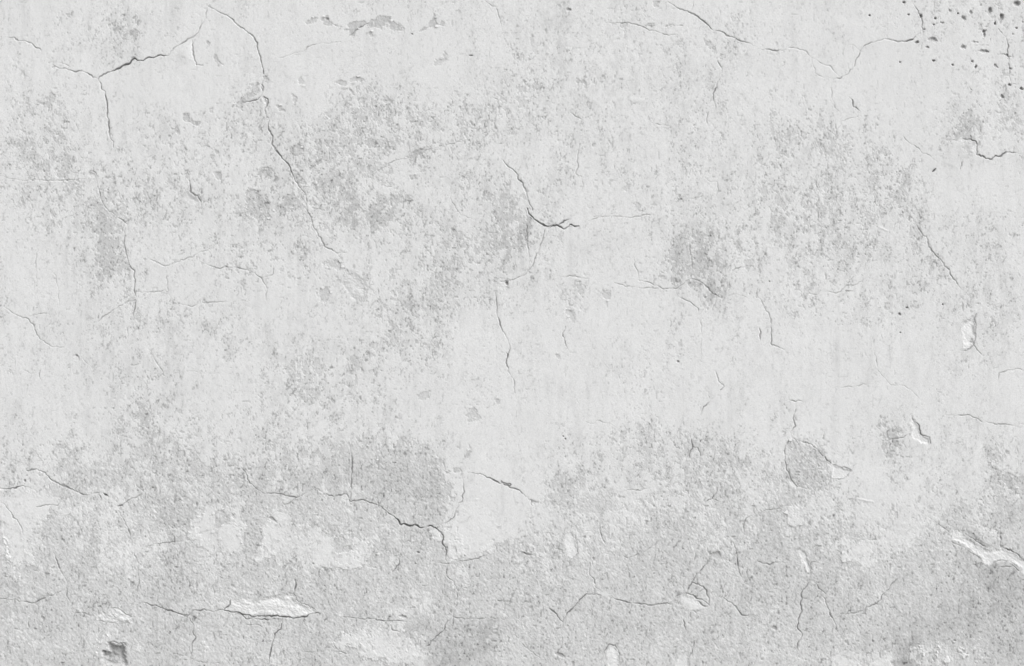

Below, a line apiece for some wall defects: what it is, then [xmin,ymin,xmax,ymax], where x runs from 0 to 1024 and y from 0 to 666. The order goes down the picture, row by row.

crack [0,7,370,254]
crack [605,0,924,146]
crack [903,134,1024,173]
crack [0,170,275,338]
crack [494,159,785,495]
crack [829,340,932,444]
crack [914,221,1024,467]
crack [0,468,319,665]
spalling [226,592,316,618]
crack [239,399,904,661]
crack [928,516,1024,572]
spalling [949,529,1024,576]